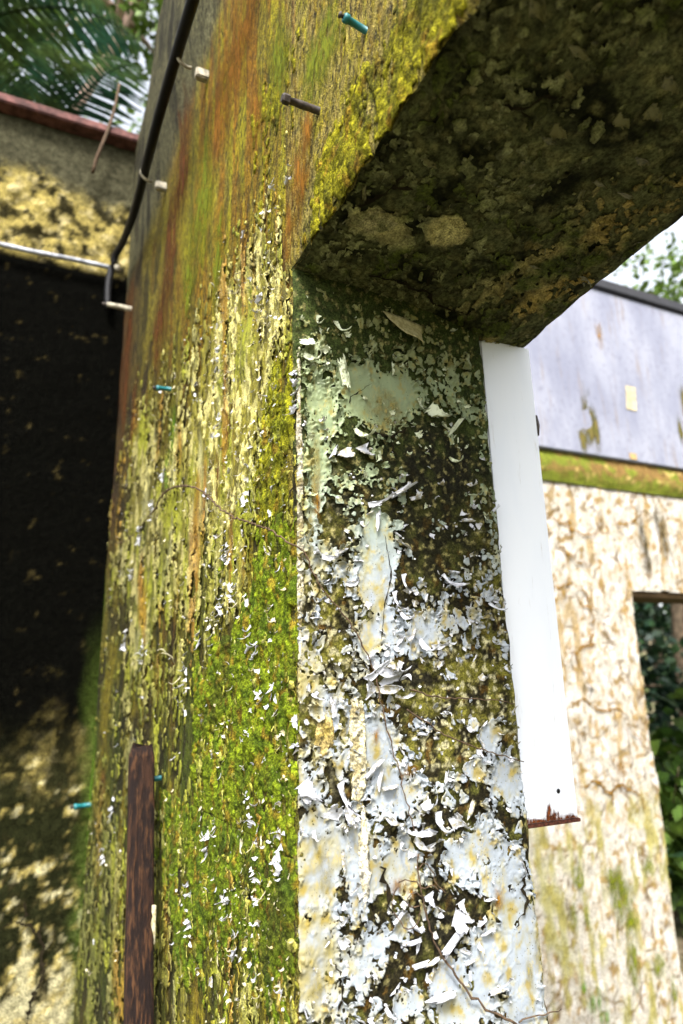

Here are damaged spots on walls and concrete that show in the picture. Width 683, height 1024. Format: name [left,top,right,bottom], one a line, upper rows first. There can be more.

peeling [612,112,630,130]
peeling [643,103,663,121]
rust [153,108,189,362]
water stain [216,398,235,498]
peeling [118,164,534,1024]
peeling [86,797,115,886]
rust [527,804,576,824]